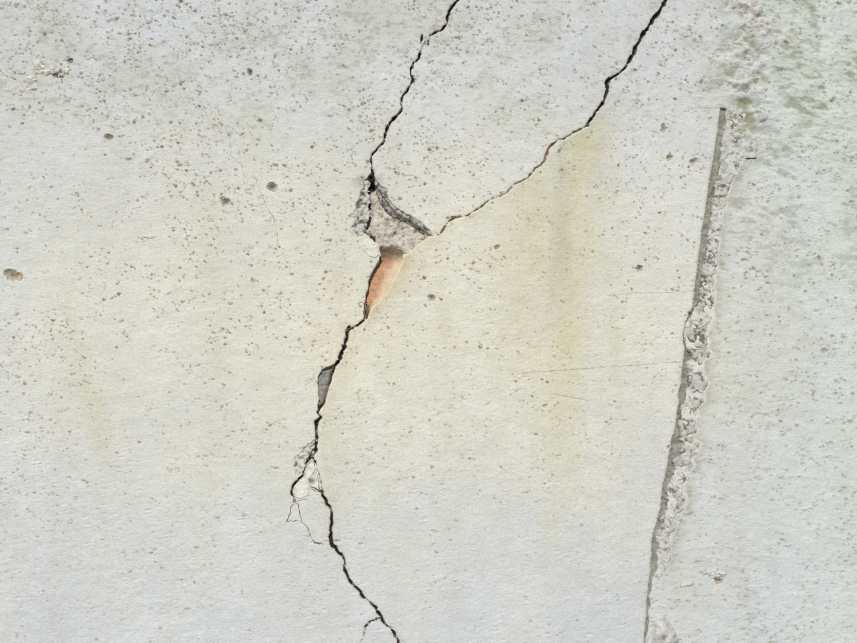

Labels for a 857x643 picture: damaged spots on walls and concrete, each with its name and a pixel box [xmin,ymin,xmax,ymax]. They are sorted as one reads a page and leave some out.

crack [368,0,459,183]
crack [428,0,667,236]
crack [330,303,369,375]
spalling [351,180,431,319]
crack [286,398,400,643]